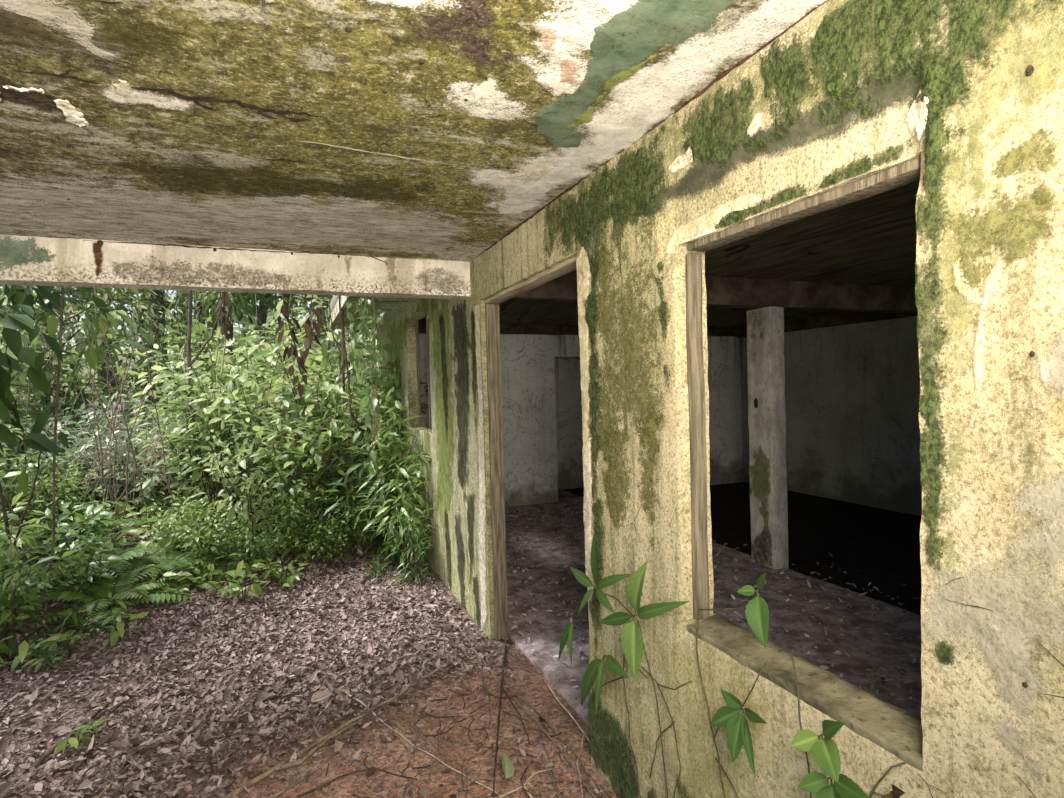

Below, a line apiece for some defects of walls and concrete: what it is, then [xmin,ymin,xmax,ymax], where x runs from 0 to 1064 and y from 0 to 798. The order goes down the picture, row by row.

spalling [0,75,89,128]
peeling [0,0,194,112]
peeling [443,78,531,121]
peeling [465,0,826,217]
corrosion [93,243,103,276]
damp [439,299,481,626]